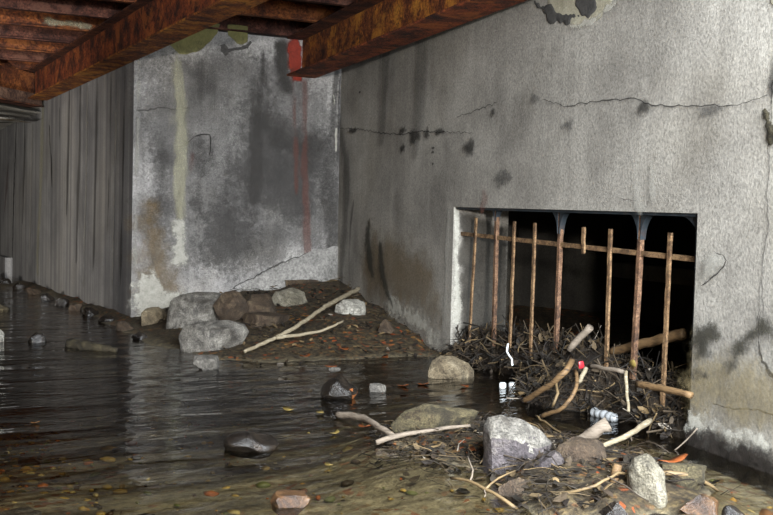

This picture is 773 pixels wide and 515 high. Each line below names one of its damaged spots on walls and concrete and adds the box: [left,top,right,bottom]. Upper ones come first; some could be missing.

peeling [534,0,616,29]
water stain [274,40,292,93]
rust [287,39,302,81]
crack [343,102,496,135]
crack [543,81,773,120]
water stain [171,220,188,266]
crack [757,144,773,378]
water stain [683,364,773,490]